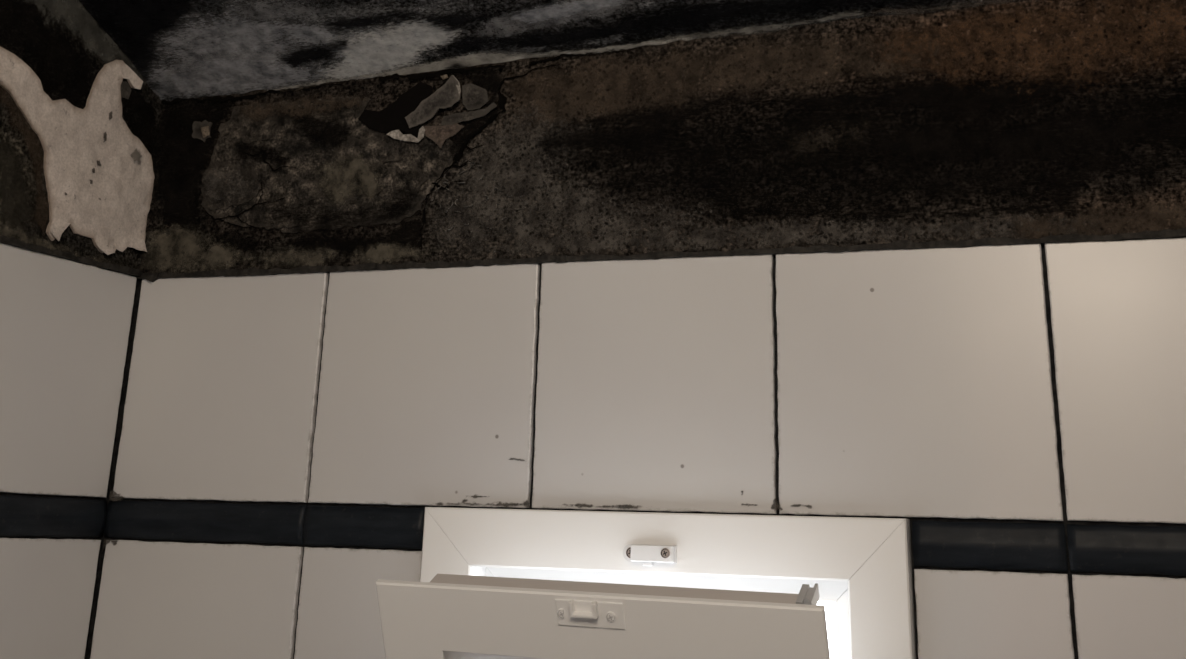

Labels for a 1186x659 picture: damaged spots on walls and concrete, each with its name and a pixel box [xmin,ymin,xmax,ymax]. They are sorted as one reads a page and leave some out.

peeling [0,46,155,255]
peeling [192,64,502,240]
damp [0,0,1186,273]